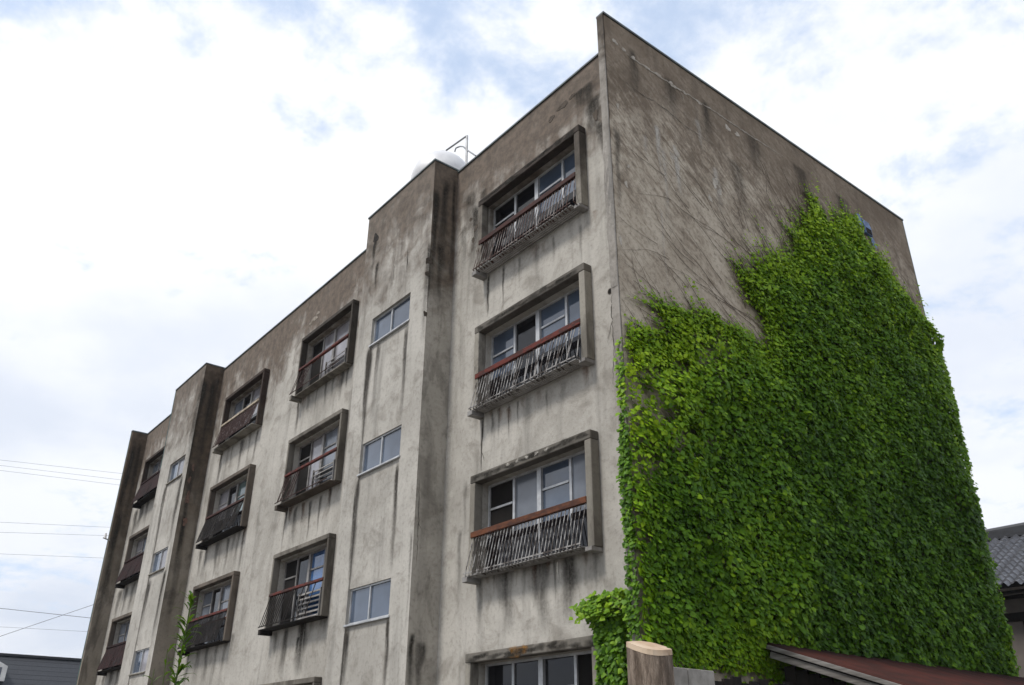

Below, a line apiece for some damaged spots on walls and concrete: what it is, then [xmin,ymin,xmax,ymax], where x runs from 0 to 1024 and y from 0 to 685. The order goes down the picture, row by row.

crack [614,41,784,157]
leakage [426,186,455,291]
leakage [189,381,219,457]
leakage [474,434,586,479]
leakage [158,470,193,544]
leakage [533,557,576,599]